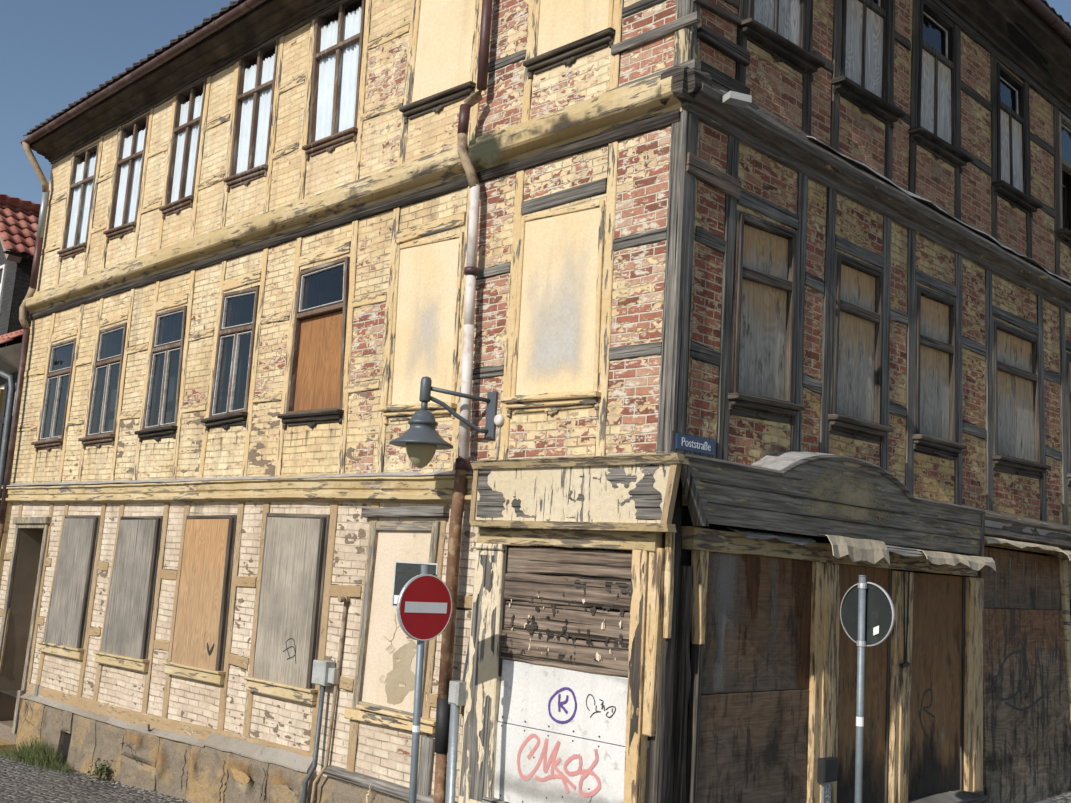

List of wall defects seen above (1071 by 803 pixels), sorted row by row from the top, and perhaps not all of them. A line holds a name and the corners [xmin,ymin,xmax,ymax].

water stain [406,165,436,181]
peeling [356,219,391,292]
spalling [248,327,287,476]
peeling [338,302,453,489]
peeling [459,126,671,802]
flaking render [379,637,417,705]